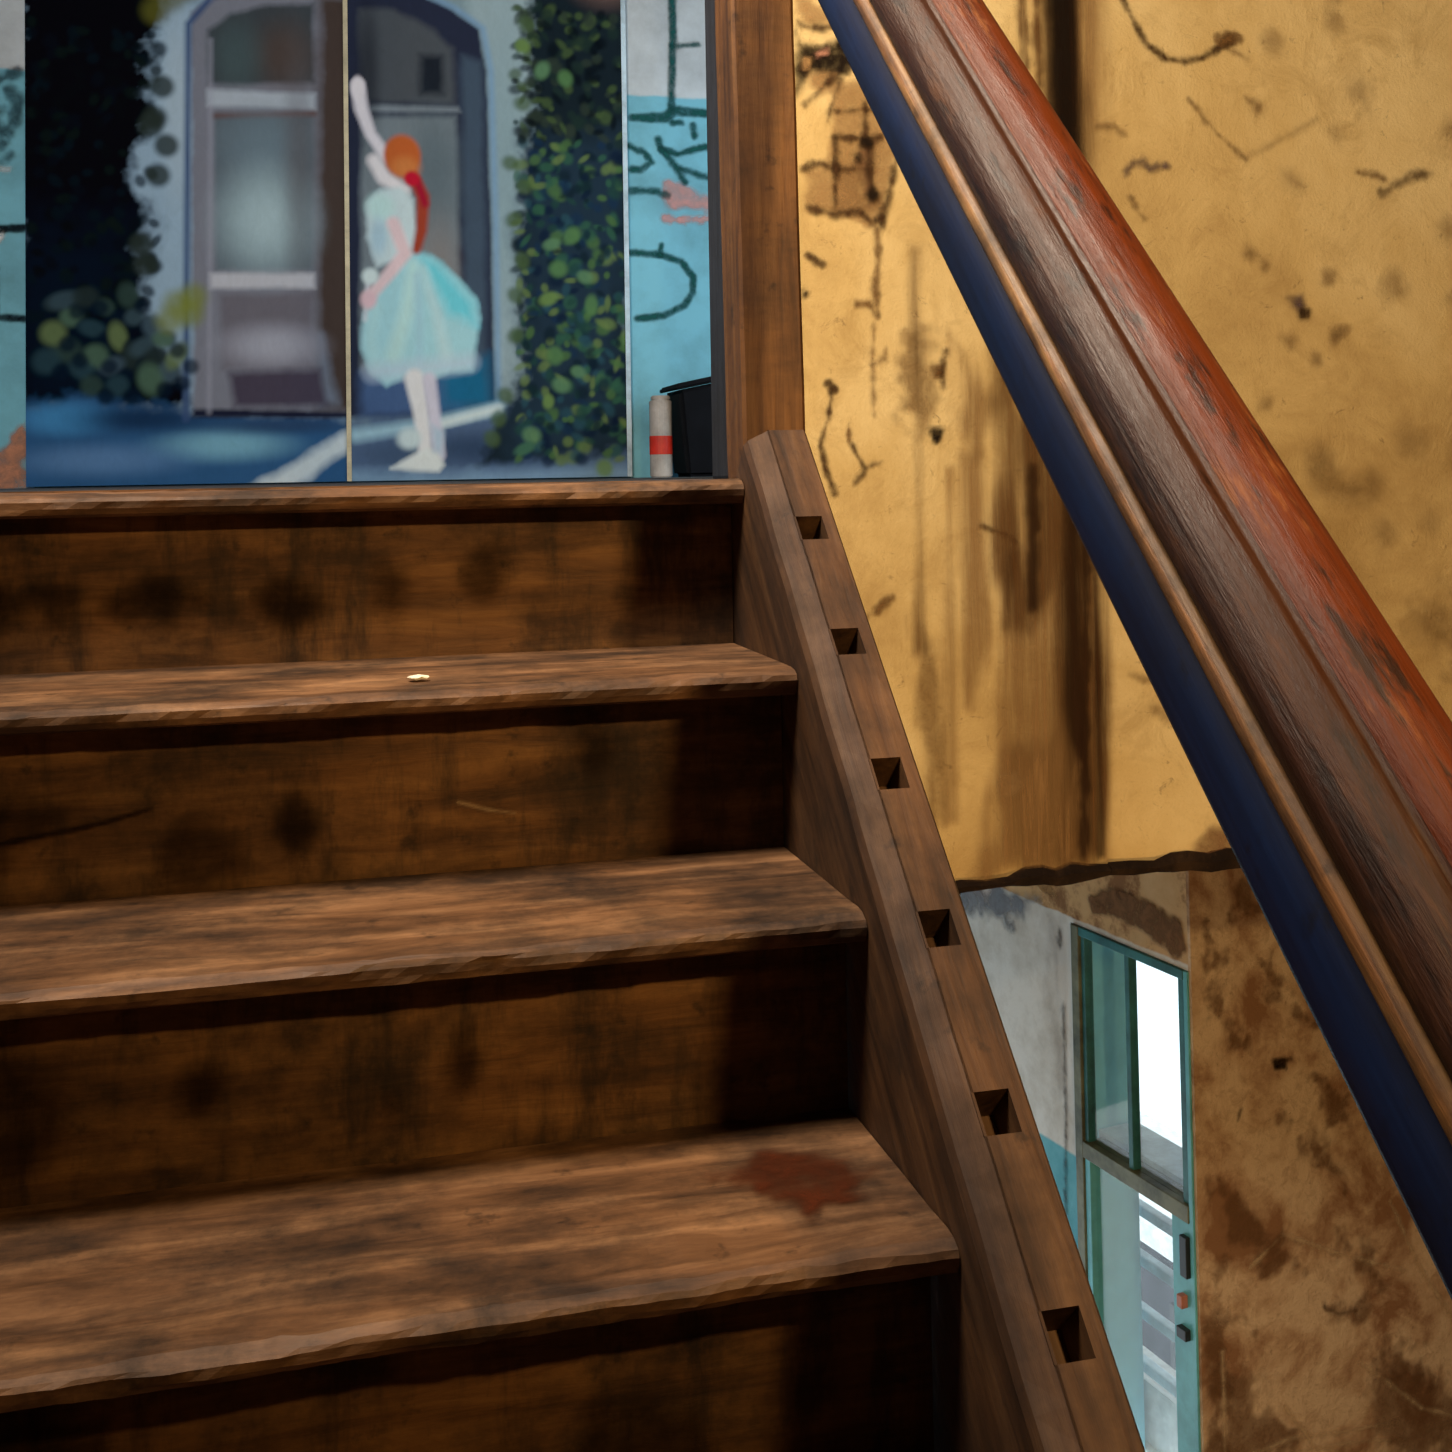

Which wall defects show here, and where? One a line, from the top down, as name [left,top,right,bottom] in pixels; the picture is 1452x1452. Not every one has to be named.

water stain [1019,0,1095,157]
peeling [0,426,26,489]
water stain [960,377,1109,917]